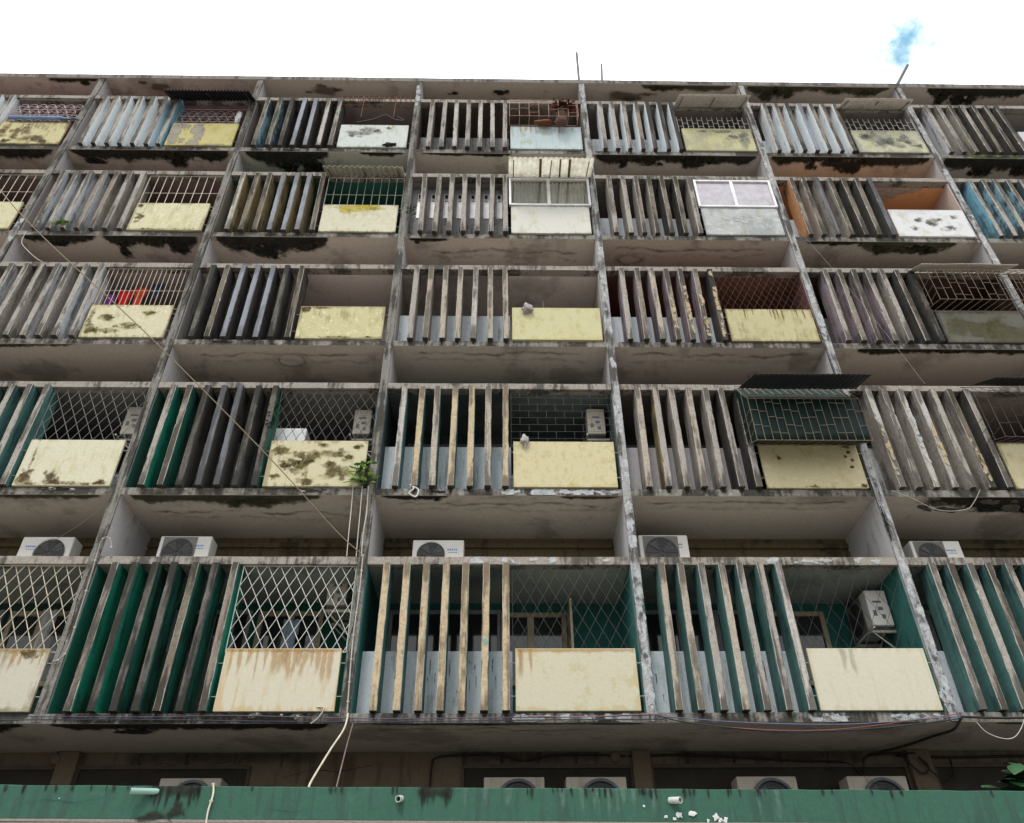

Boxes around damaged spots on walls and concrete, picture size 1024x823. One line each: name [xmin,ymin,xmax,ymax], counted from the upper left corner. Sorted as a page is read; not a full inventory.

leakage [927,88,1024,105]
leakage [0,124,53,160]
leakage [70,146,228,168]
leakage [22,204,198,258]
leakage [216,232,328,260]
leakage [807,242,956,255]
peeling [669,271,726,337]
peeling [613,394,624,435]
leakage [0,458,104,499]
leakage [130,443,362,515]
peeling [632,570,656,713]
leakage [419,787,452,805]